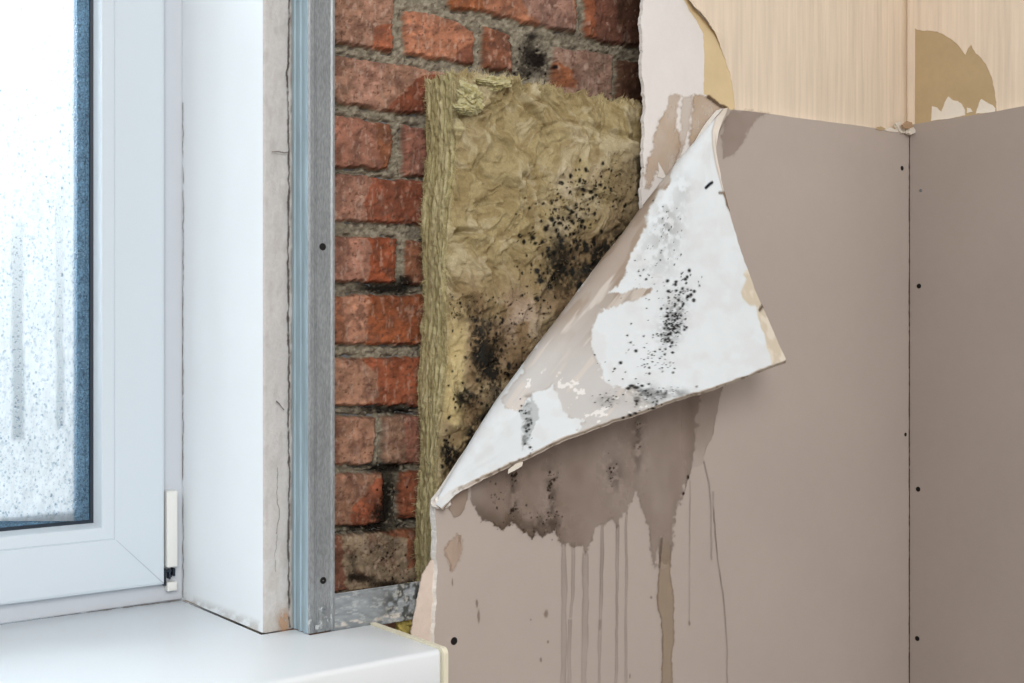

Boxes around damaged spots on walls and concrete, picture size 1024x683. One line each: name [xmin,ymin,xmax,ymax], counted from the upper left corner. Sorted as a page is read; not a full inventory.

peeling [876,29,996,135]
water stain [440,95,728,475]
water stain [449,472,563,542]
water stain [657,559,674,683]